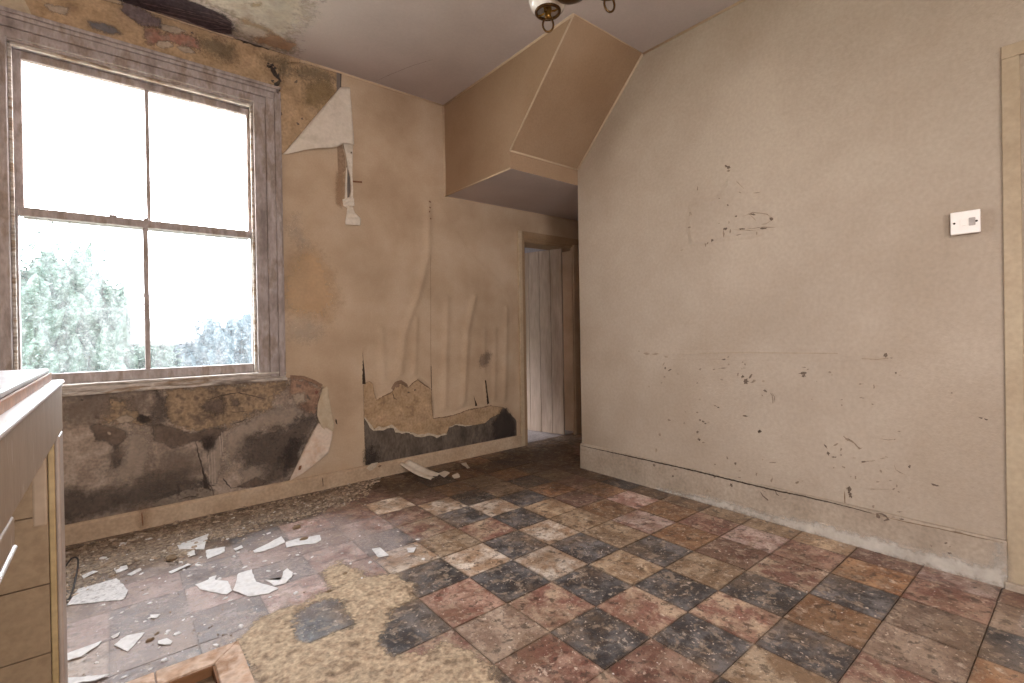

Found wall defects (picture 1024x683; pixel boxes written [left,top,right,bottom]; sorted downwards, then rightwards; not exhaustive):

flaking render [25,0,337,154]
damp [254,34,296,93]
damp [64,390,226,522]
flaking render [62,375,322,525]
damp [243,413,316,484]
flaking render [363,376,507,471]
damp [658,489,1005,586]